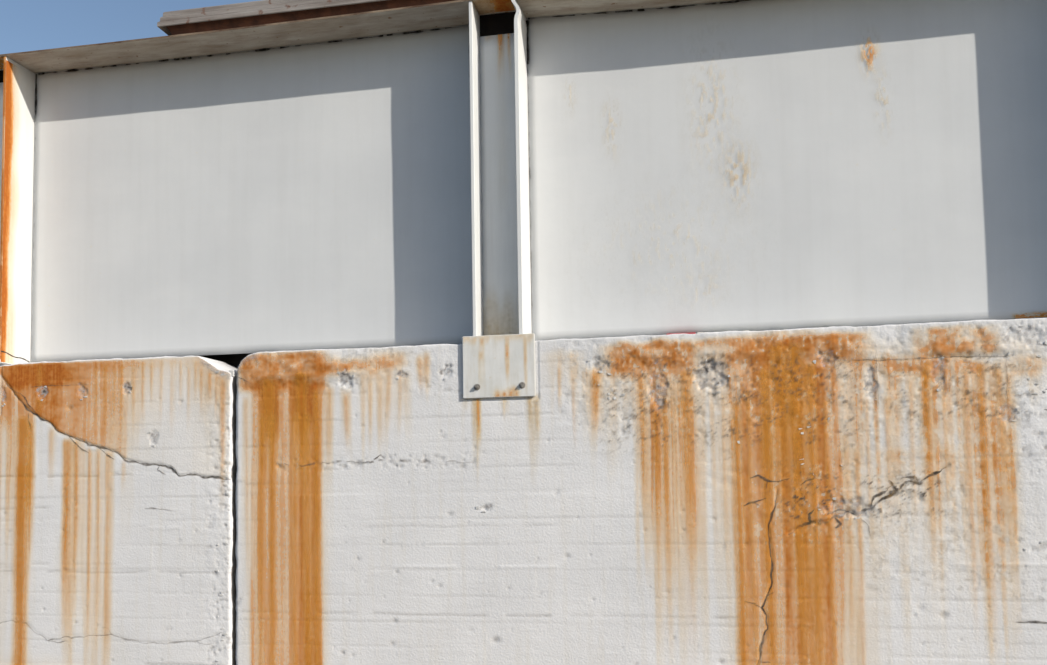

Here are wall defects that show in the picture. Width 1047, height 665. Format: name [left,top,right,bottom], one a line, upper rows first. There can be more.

corrosion [0,56,134,665]
crack [1,351,230,480]
corrosion [240,352,394,665]
corrosion [610,340,711,519]
crack [744,475,816,664]
corrosion [725,329,995,665]
crack [804,467,946,533]
corrosion [972,392,1016,575]